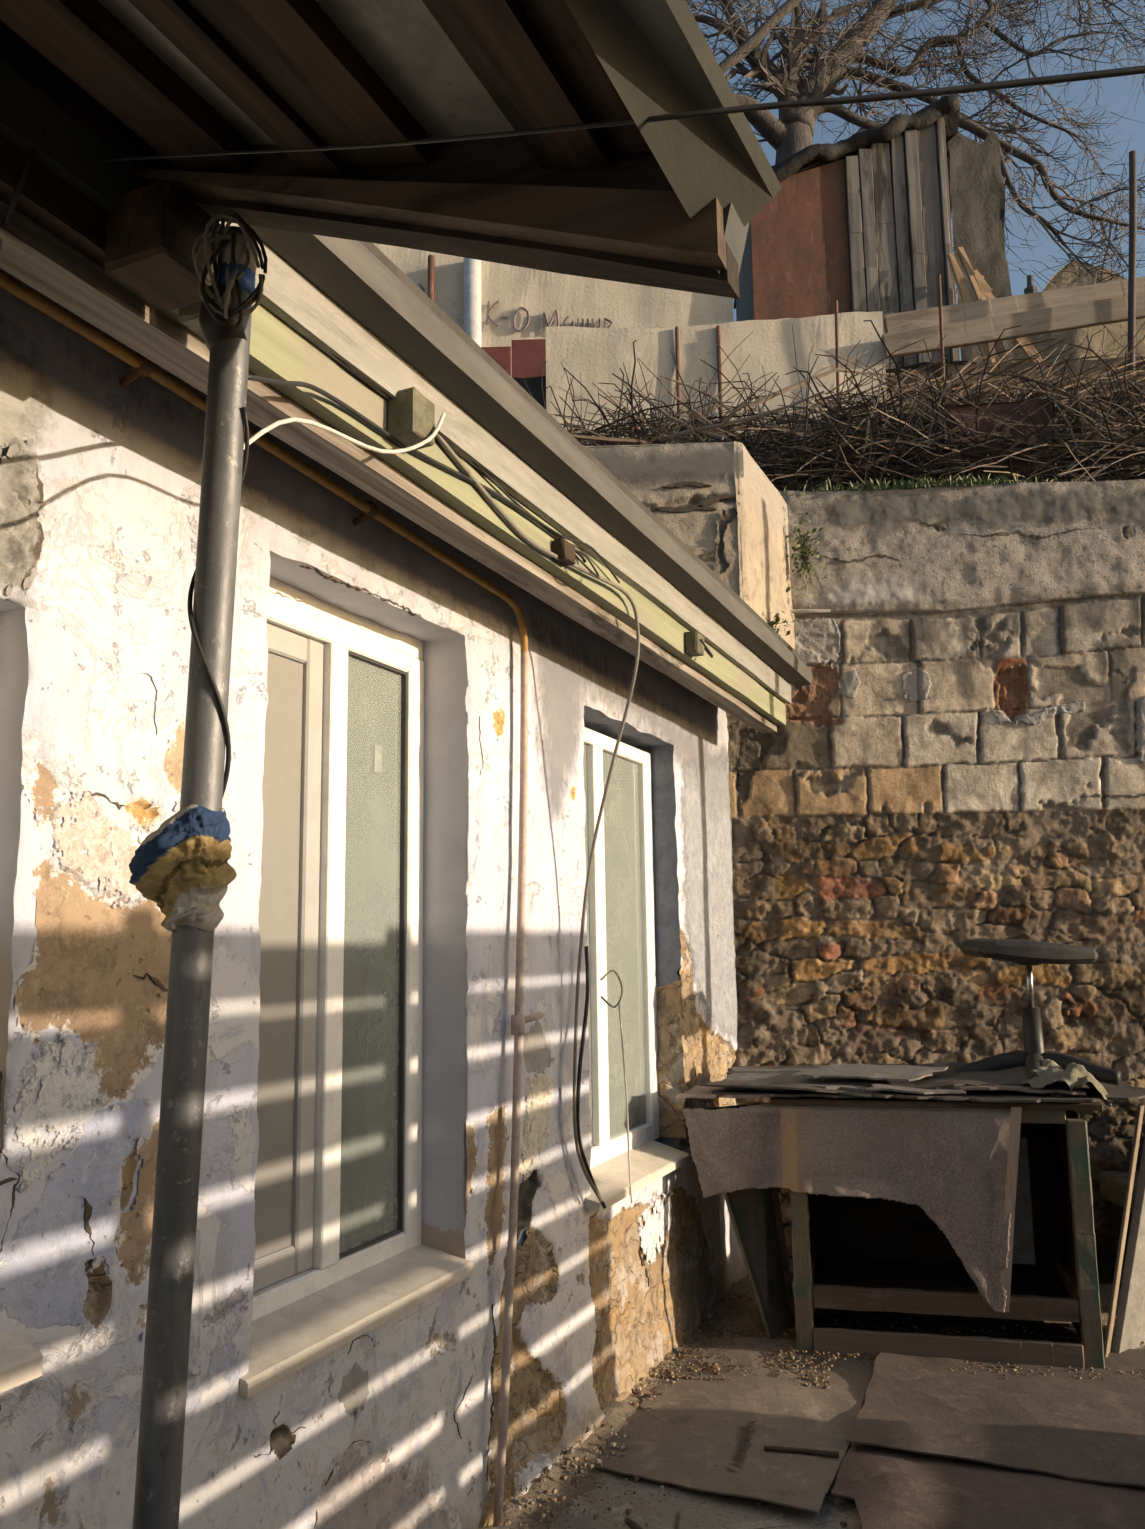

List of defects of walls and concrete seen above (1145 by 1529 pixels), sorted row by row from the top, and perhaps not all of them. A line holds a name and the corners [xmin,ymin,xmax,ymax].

flaking render [0,317,49,605]
crack [300,565,421,616]
flaking render [785,662,843,727]
spalling [993,664,1028,725]
peeling [4,718,185,1342]
flaking render [588,1186,714,1412]
spalling [270,1424,299,1459]